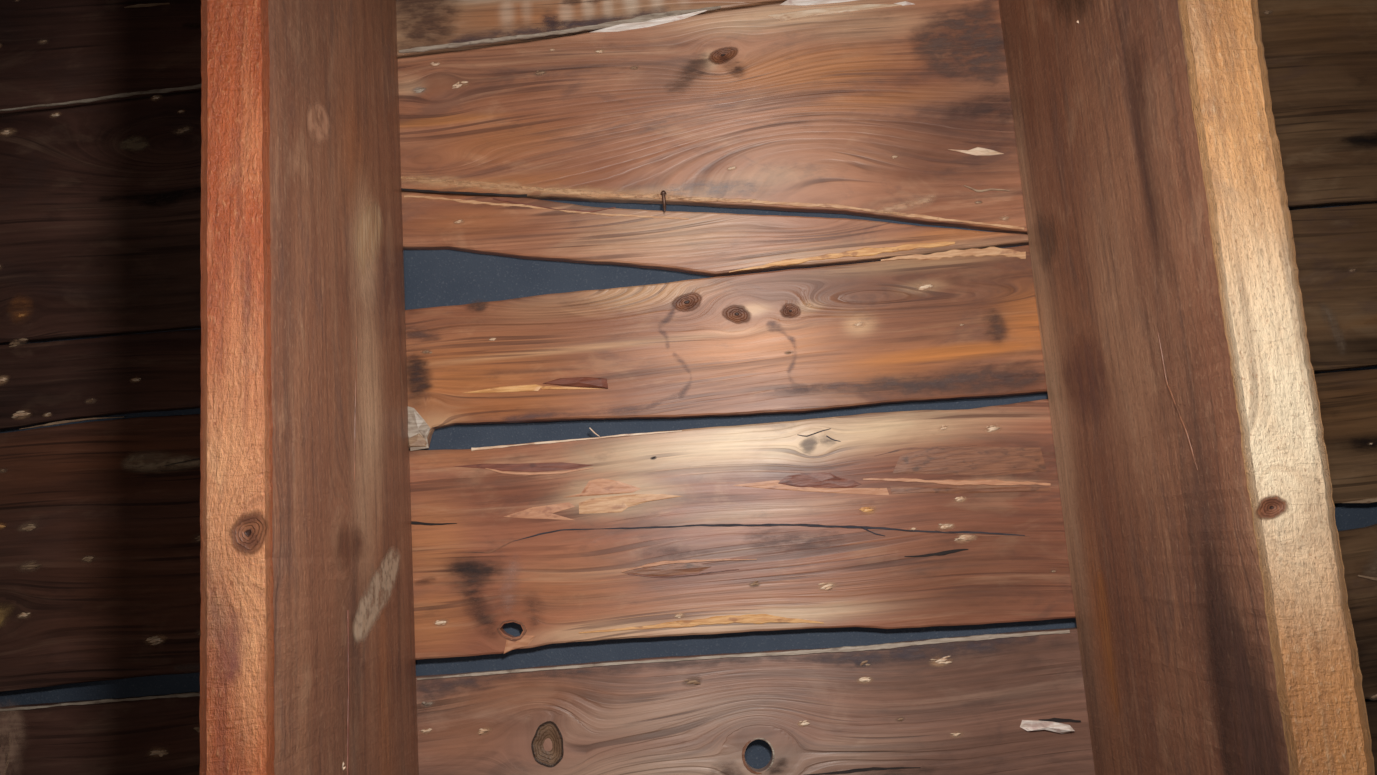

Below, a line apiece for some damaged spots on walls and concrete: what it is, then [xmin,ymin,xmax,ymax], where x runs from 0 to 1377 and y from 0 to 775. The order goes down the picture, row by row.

damp [918,5,1006,80]
crack [401,176,1024,230]
crack [411,521,1030,557]